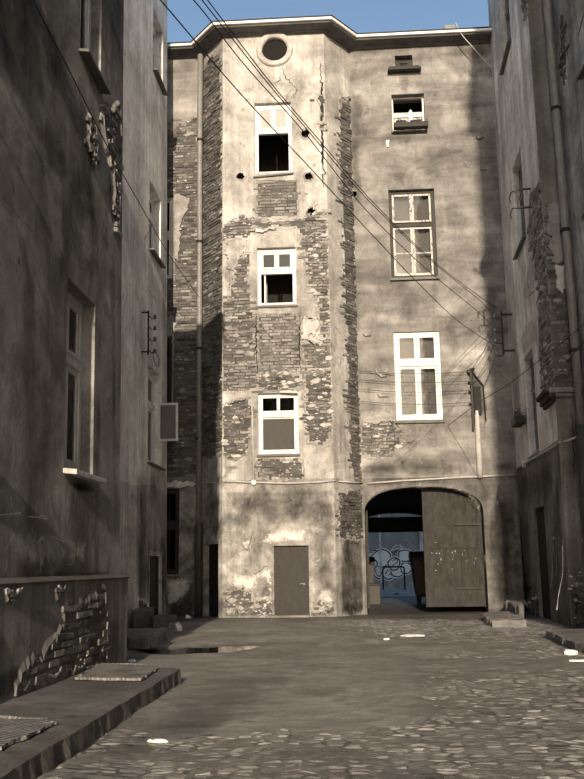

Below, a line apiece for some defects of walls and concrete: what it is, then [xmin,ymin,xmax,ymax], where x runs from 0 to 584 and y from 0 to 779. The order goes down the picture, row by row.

spalling [558,11,570,97]
flaking render [83,100,124,243]
crack [318,63,326,187]
flaking render [167,50,417,544]
flaking render [527,177,574,392]
flaking render [13,582,110,696]
spalling [222,584,273,617]
spalling [312,598,337,617]